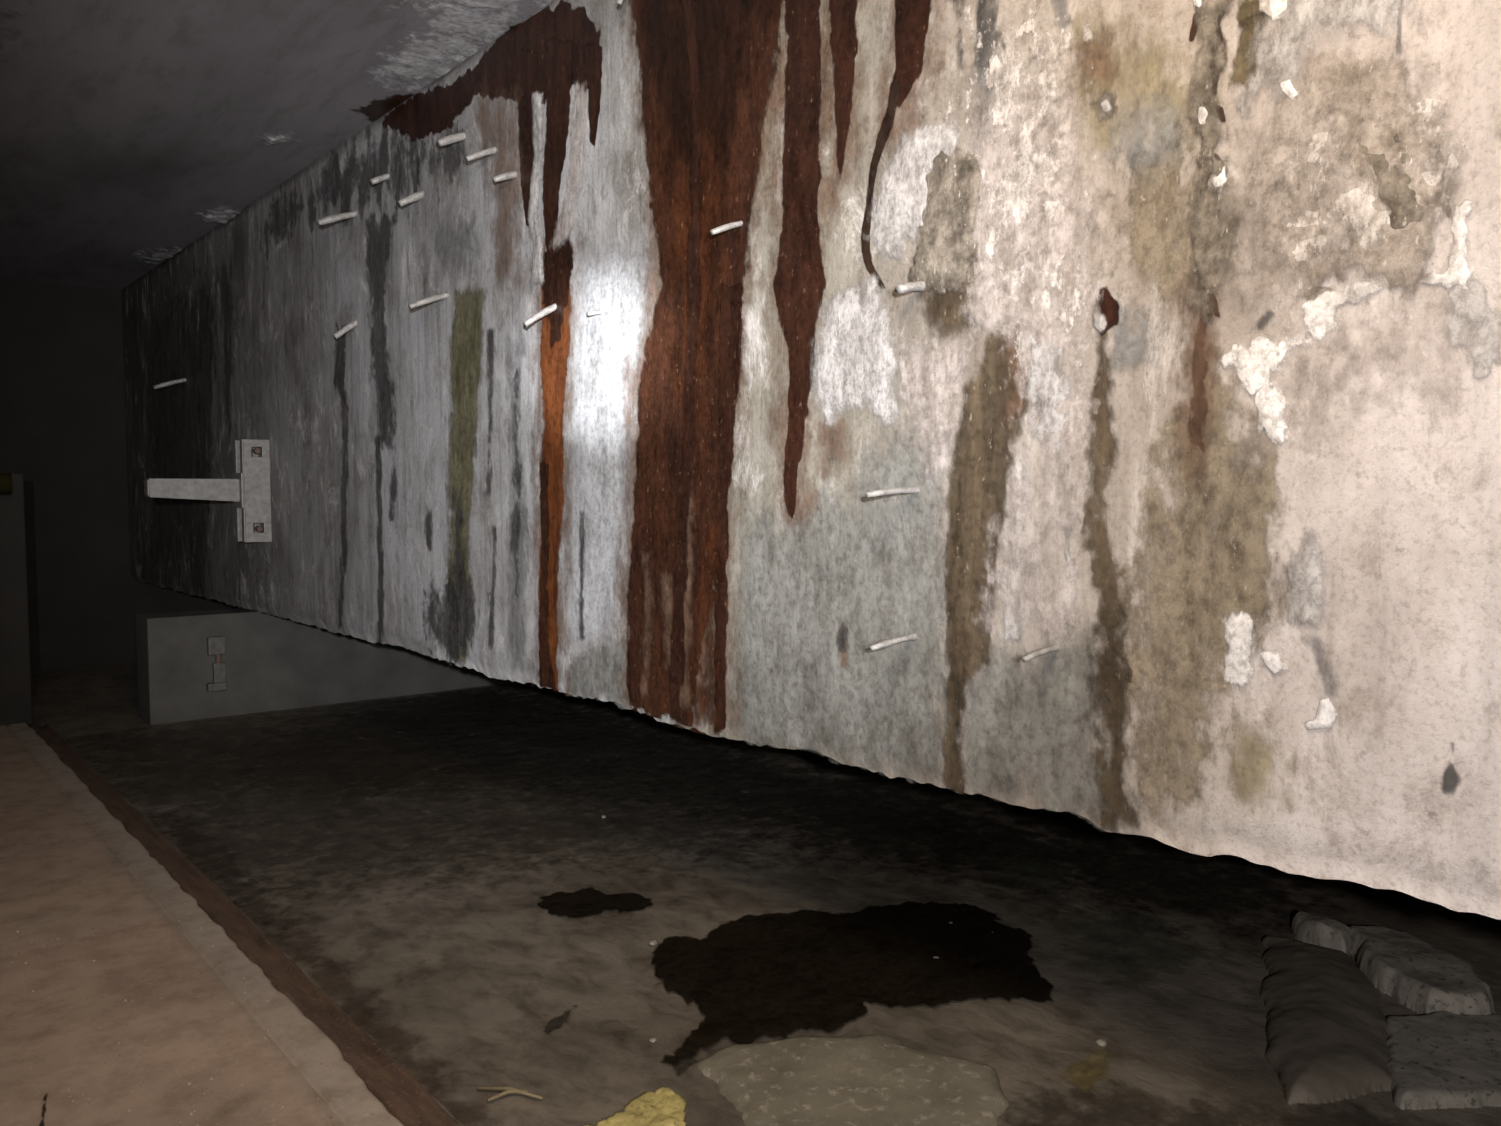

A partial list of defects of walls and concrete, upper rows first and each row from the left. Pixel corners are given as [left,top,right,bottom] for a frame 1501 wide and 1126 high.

leakage [197,206,242,224]
leakage [264,118,468,643]
leakage [423,286,525,666]
corrosion [354,0,602,691]
corrosion [618,0,858,733]
corrosion [861,0,943,289]
leakage [811,0,1190,833]